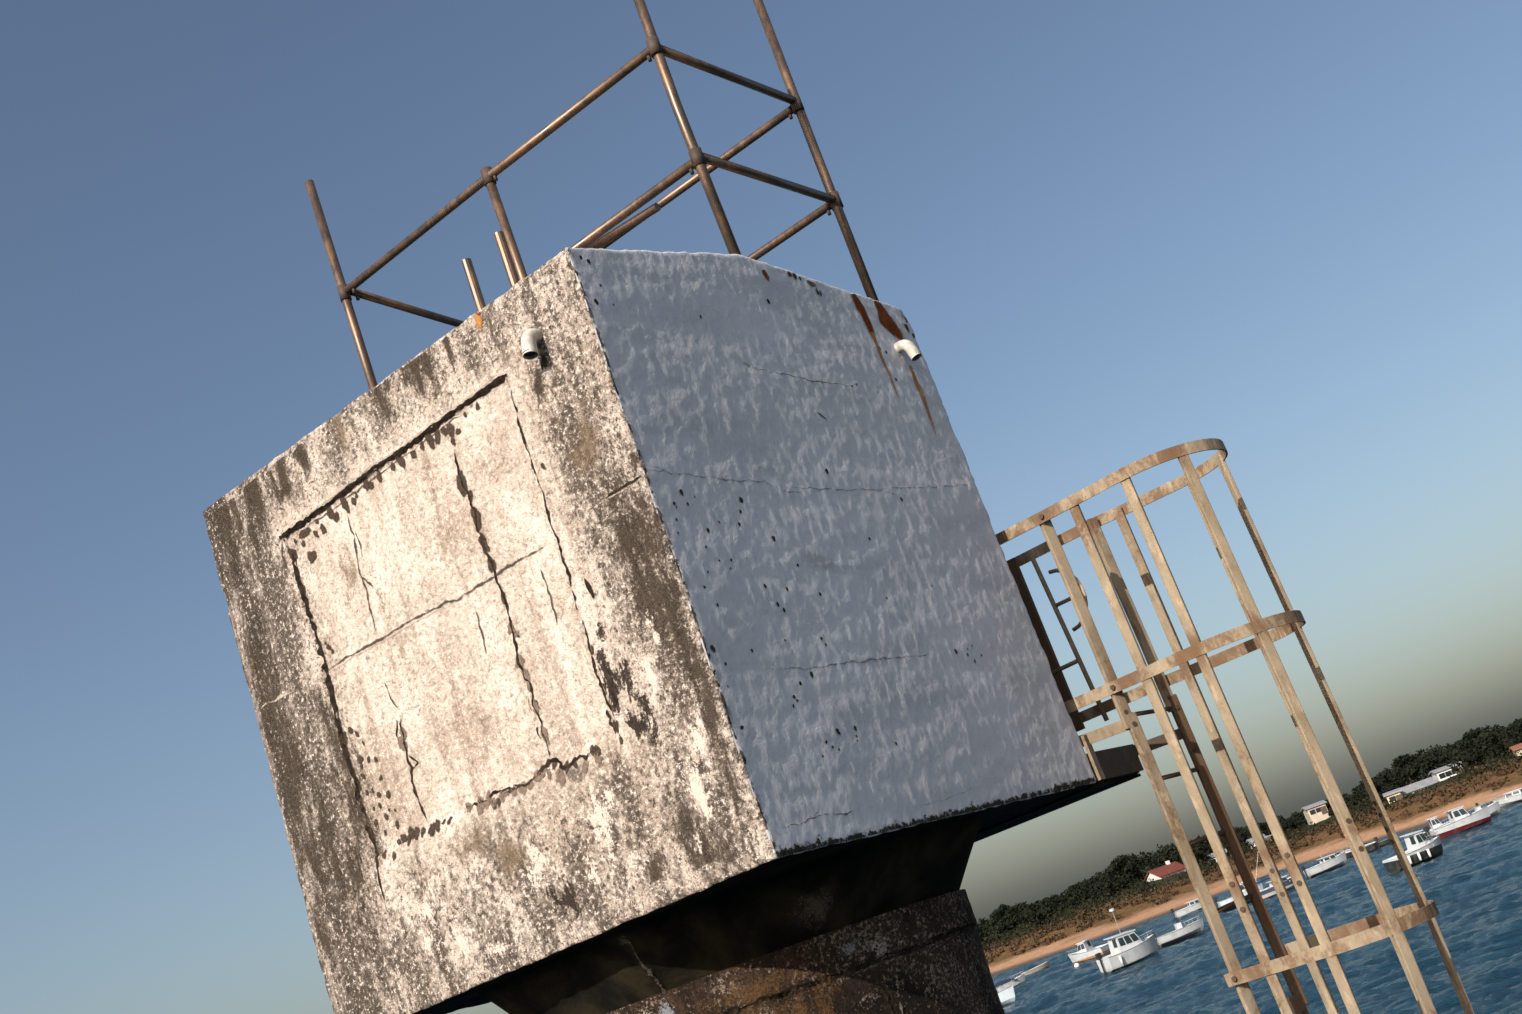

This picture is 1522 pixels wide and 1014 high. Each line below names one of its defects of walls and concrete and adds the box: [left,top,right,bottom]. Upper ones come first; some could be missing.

rust [851,294,903,395]
damp [373,336,456,426]
damp [533,355,553,402]
crack [742,361,852,419]
rust [909,365,934,429]
crack [605,466,974,499]
damp [210,444,310,590]
crack [262,373,623,908]
crack [767,654,928,670]
damp [244,611,392,998]
damp [842,933,889,958]